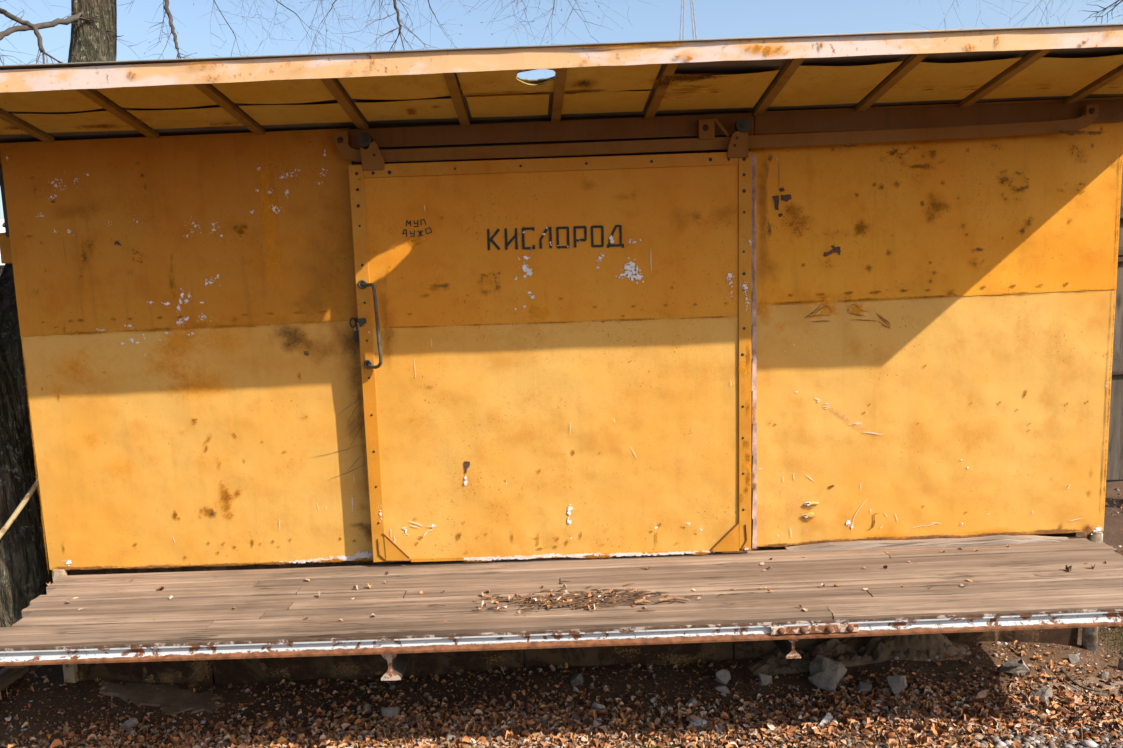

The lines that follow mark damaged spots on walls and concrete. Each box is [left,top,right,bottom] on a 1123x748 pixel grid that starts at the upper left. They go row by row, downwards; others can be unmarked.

rust [572,42,693,62]
rust [747,44,788,55]
peeling [616,257,644,284]
peeling [147,288,207,342]
rust [30,417,47,552]
rust [200,480,240,518]
rust [57,542,251,570]